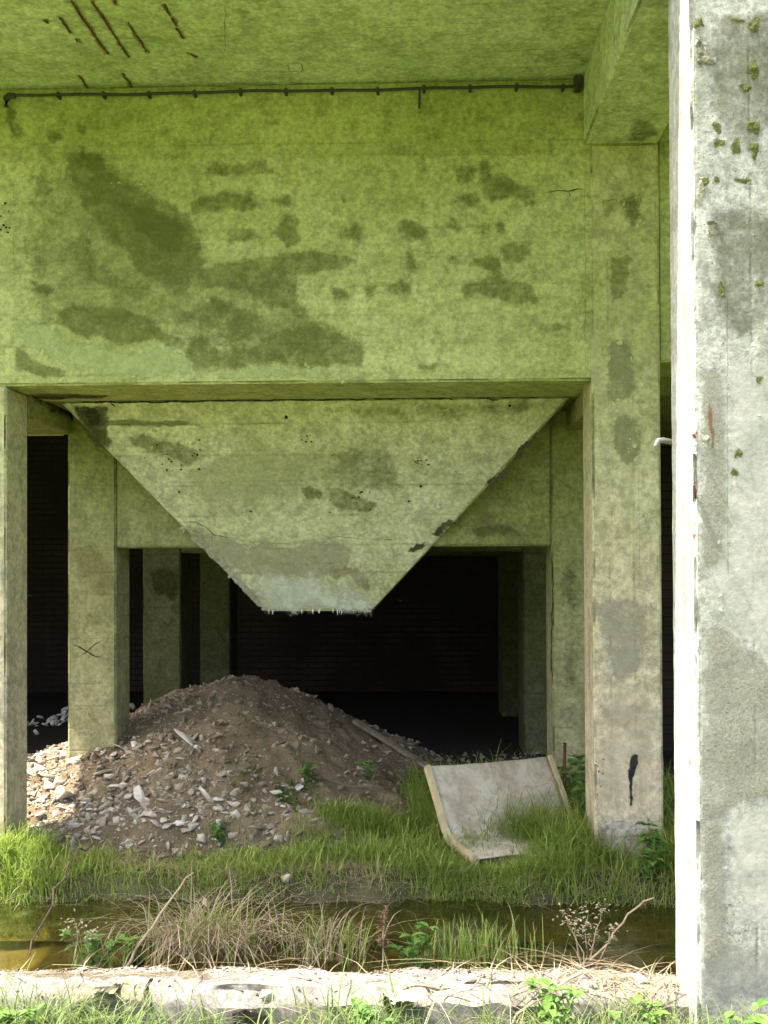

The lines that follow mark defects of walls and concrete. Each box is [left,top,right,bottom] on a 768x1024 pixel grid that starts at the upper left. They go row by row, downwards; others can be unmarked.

corrosion [43,0,130,58]
leakage [33,394,187,447]
leakage [628,754,638,806]